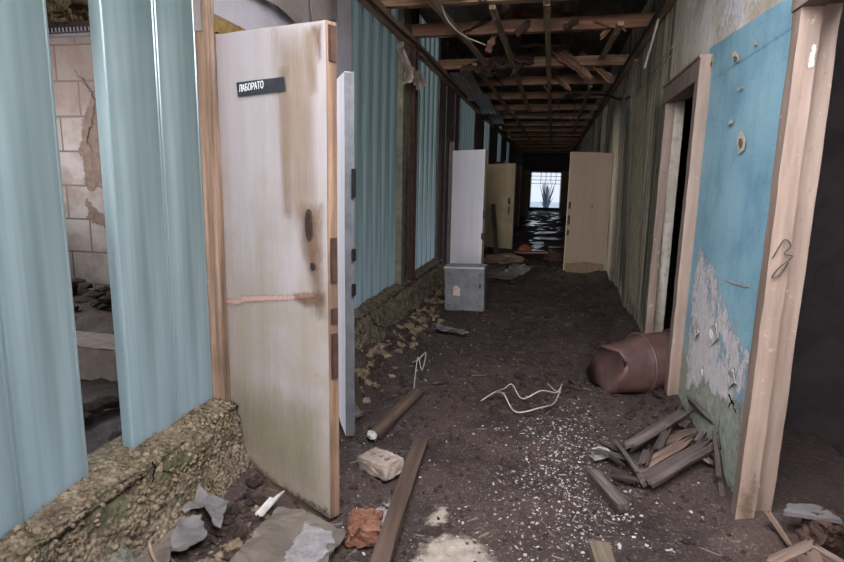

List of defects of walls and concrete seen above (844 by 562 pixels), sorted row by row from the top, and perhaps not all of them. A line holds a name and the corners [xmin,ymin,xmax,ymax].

crack [74,70,97,150]
flaking render [78,86,106,228]
peeling [682,248,749,406]